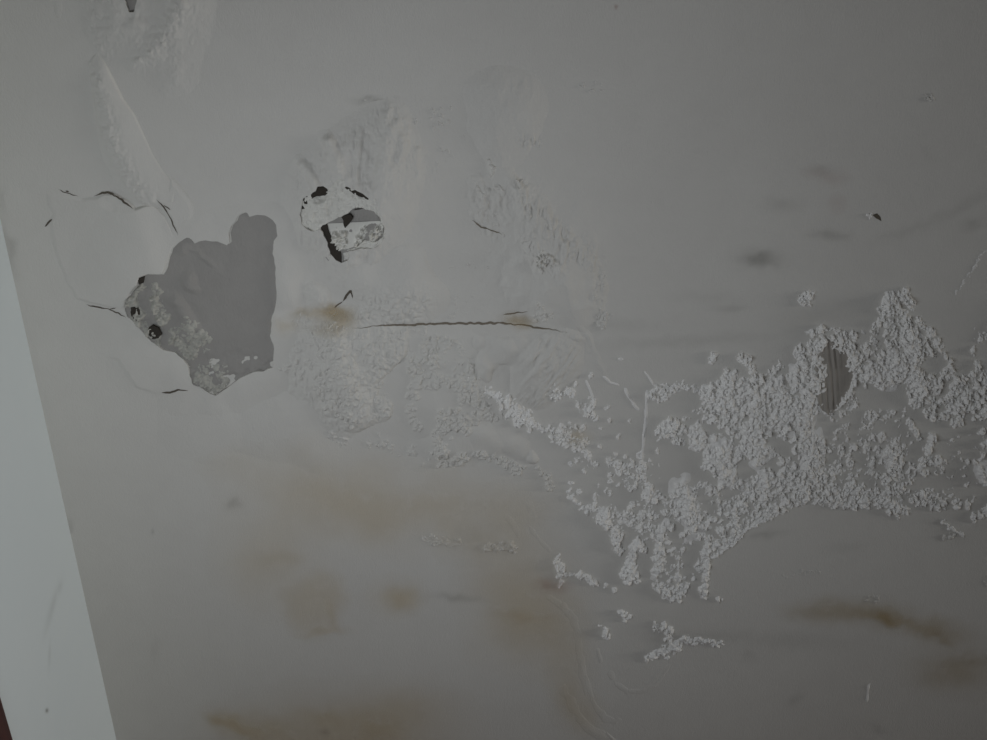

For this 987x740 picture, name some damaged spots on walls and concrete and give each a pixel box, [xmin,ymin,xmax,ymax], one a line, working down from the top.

spalling [46,177,315,416]
crack [360,312,567,333]
spalling [468,287,987,604]